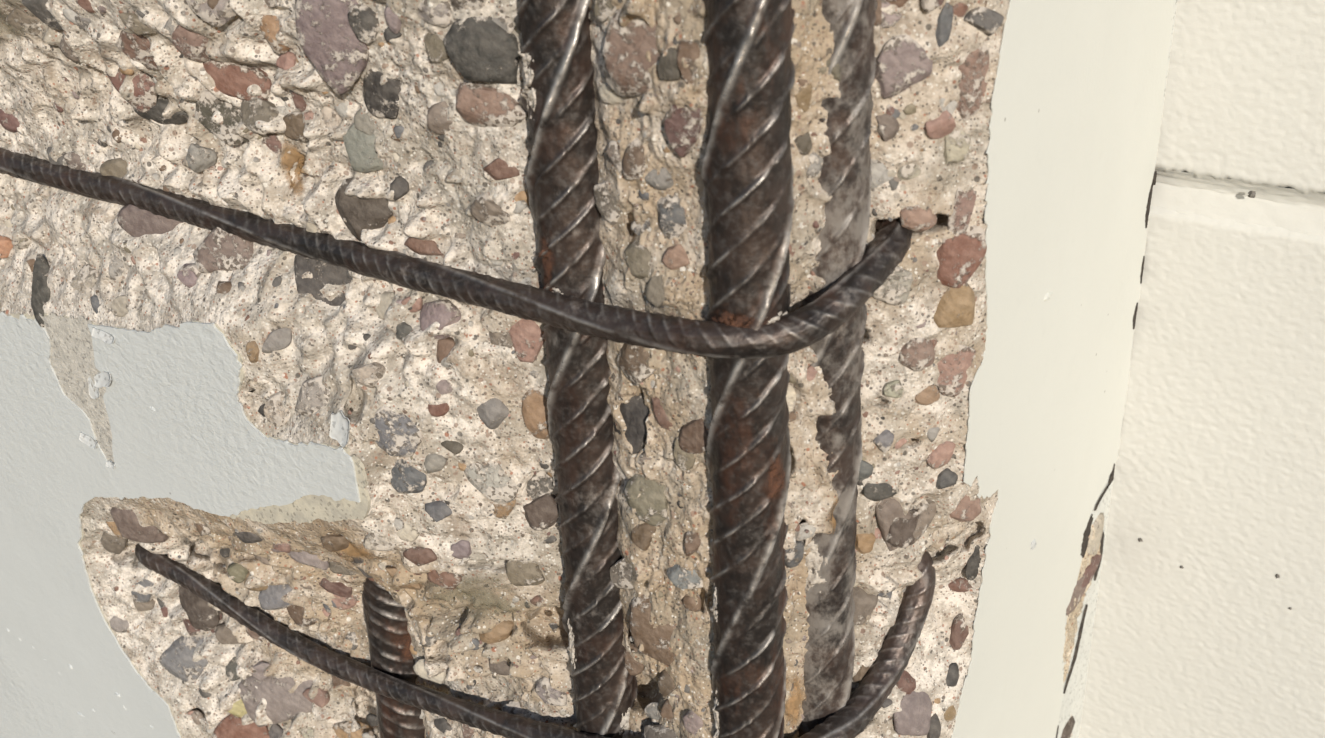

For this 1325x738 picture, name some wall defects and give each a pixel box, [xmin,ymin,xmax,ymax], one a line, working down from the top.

spalling [0,0,542,289]
rust [281,144,305,193]
spalling [588,0,710,321]
spalling [788,0,841,314]
spalling [0,173,577,738]
rust [398,634,413,661]
spalling [606,340,716,738]
spalling [783,346,838,738]
spalling [849,0,1010,738]
spalling [1061,715,1075,738]
spalling [1063,513,1104,683]